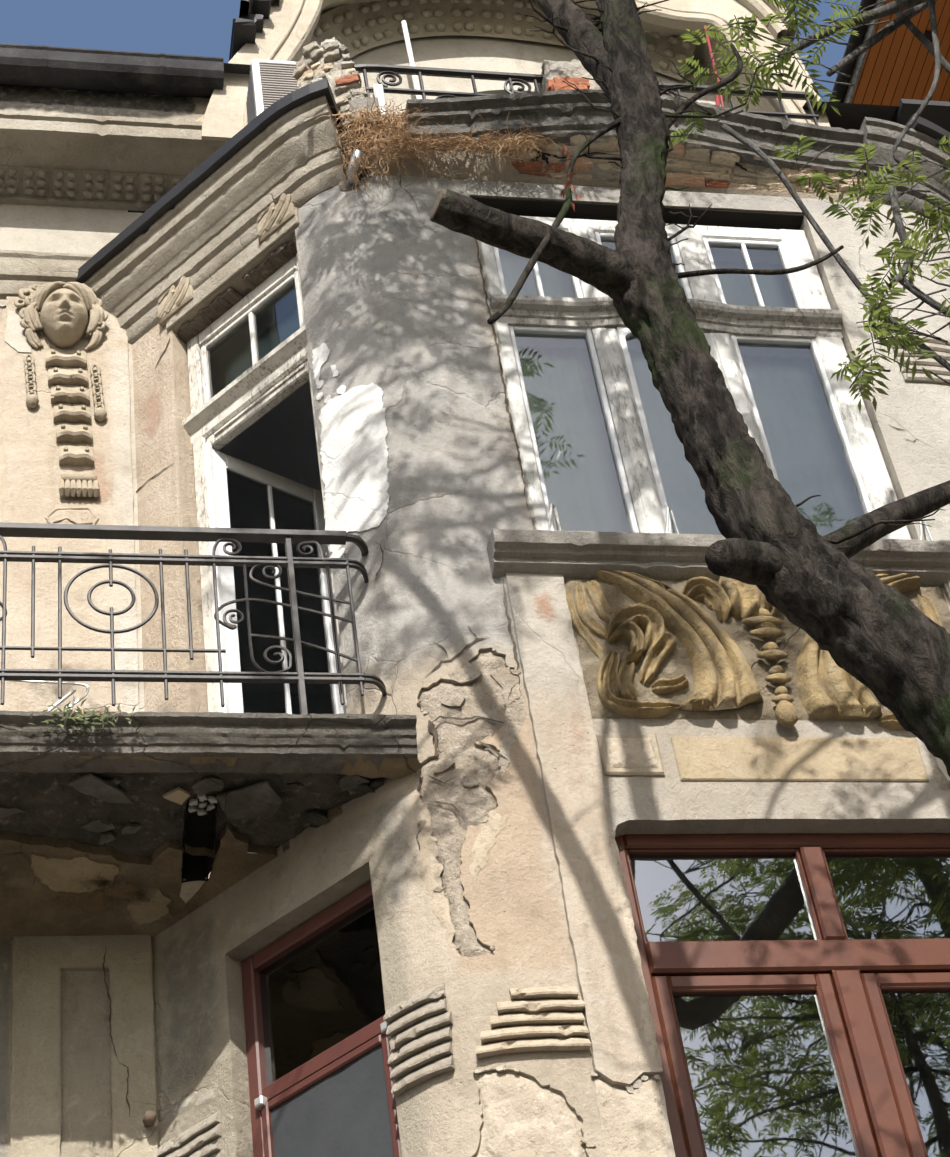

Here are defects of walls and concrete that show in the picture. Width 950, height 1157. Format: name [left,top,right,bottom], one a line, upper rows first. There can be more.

flaking render [508,132,622,182]
flaking render [665,141,867,195]
spalling [0,766,387,893]
flaking render [417,648,526,957]
flaking render [930,753,950,790]
flaking render [127,877,207,925]
crack [102,952,130,1117]
flaking render [473,824,669,1157]